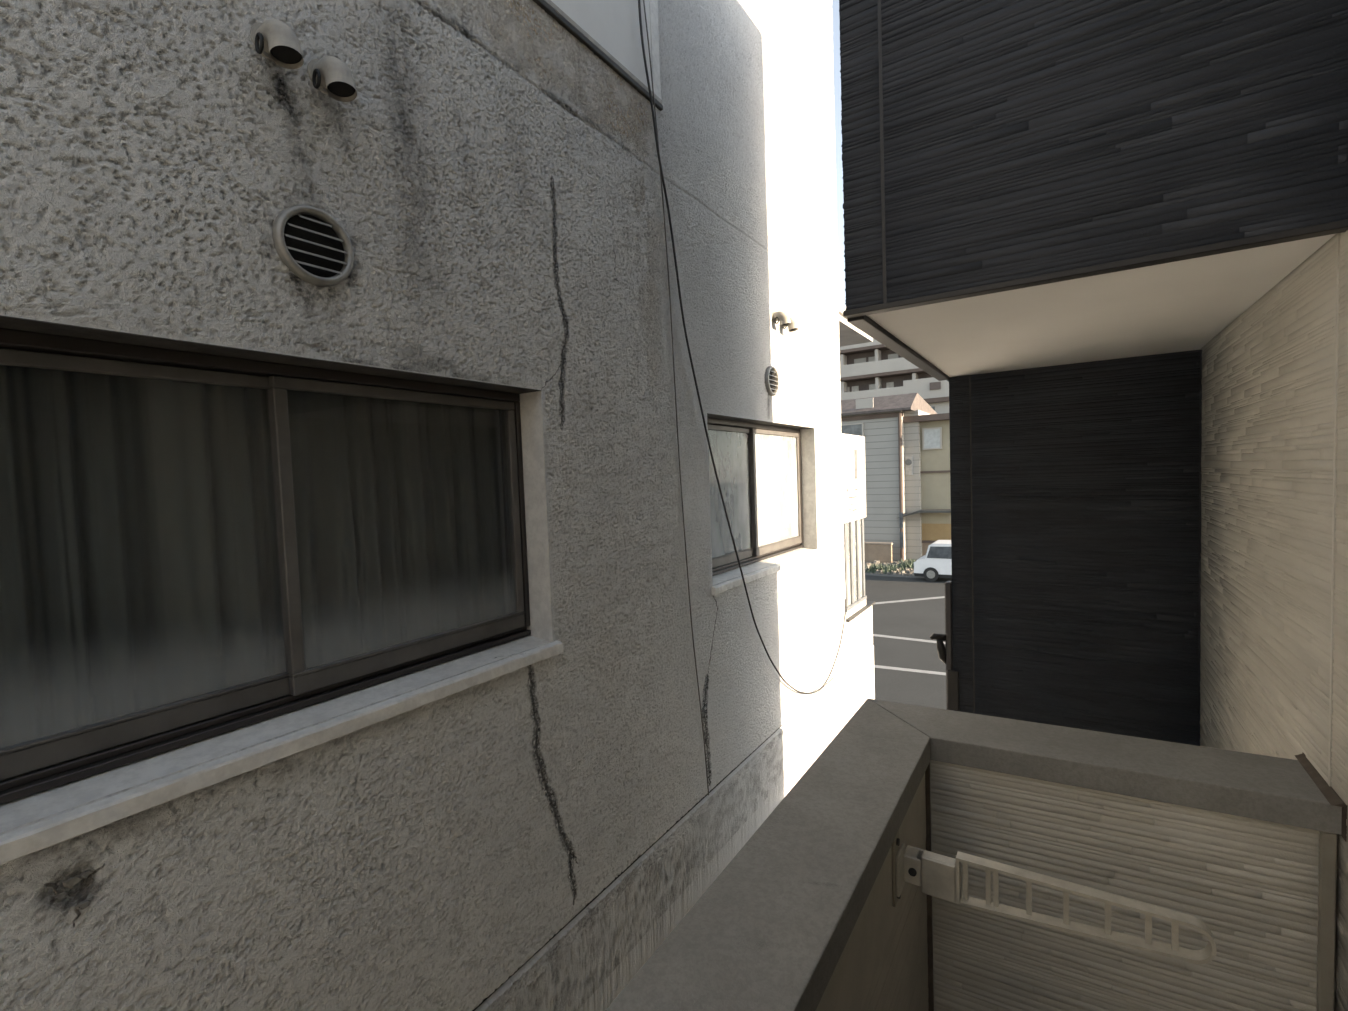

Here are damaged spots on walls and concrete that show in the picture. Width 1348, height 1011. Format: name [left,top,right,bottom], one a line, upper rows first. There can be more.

crack [541,177,569,430]
crack [495,655,578,905]
crack [701,596,718,785]